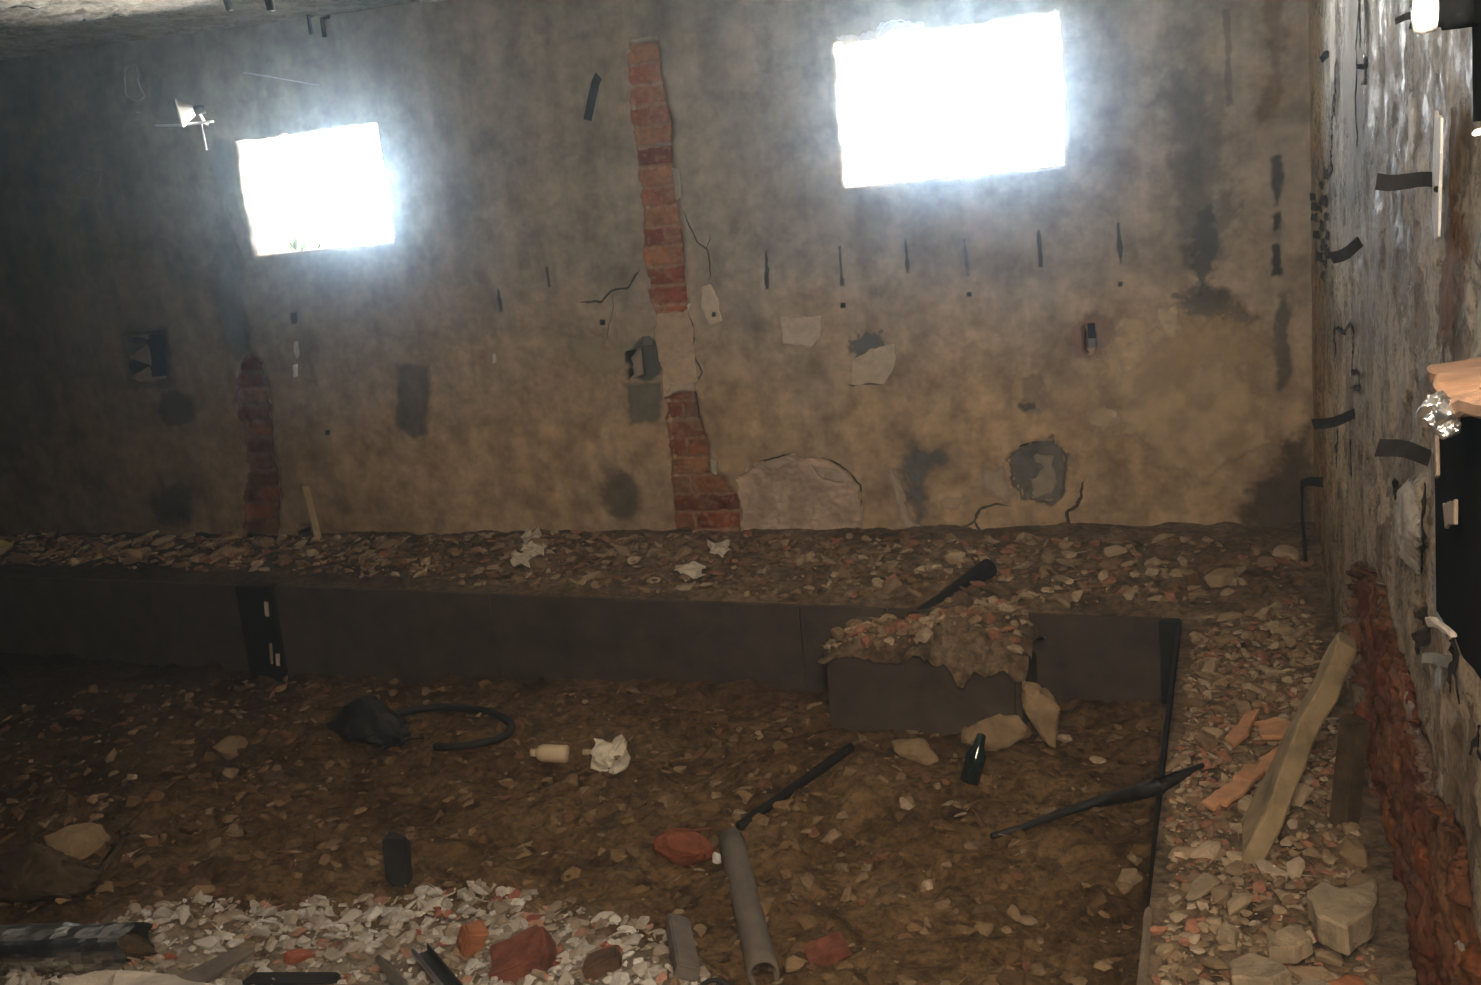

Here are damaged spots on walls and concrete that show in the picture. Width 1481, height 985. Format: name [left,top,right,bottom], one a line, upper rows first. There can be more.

spalling [628,35,723,326]
spalling [983,434,1068,505]
spalling [1342,561,1481,985]